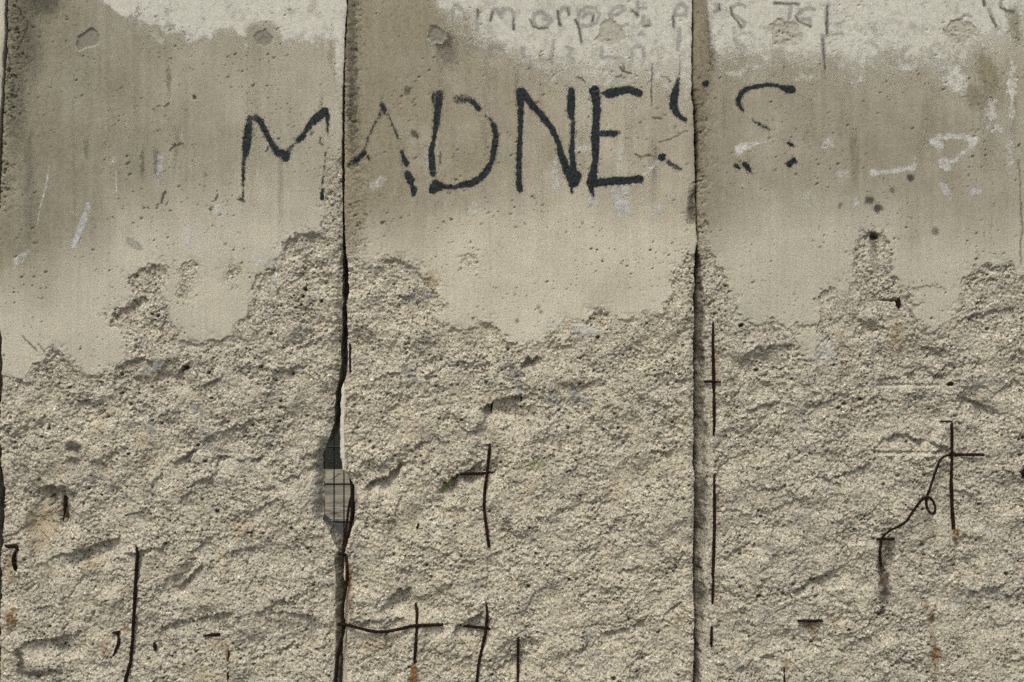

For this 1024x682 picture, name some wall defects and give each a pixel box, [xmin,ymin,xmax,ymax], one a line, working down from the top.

spalling [0,157,1024,682]
rust [876,551,892,614]